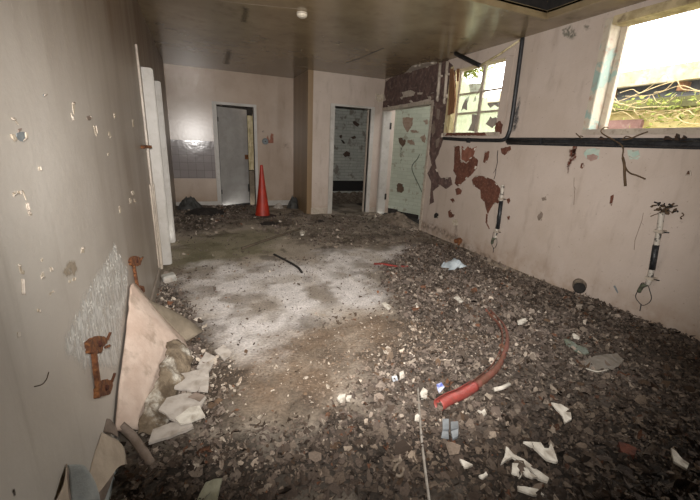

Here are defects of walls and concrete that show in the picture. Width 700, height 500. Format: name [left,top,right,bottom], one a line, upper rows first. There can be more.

spalling [10,117,29,142]
flaking render [383,60,510,229]